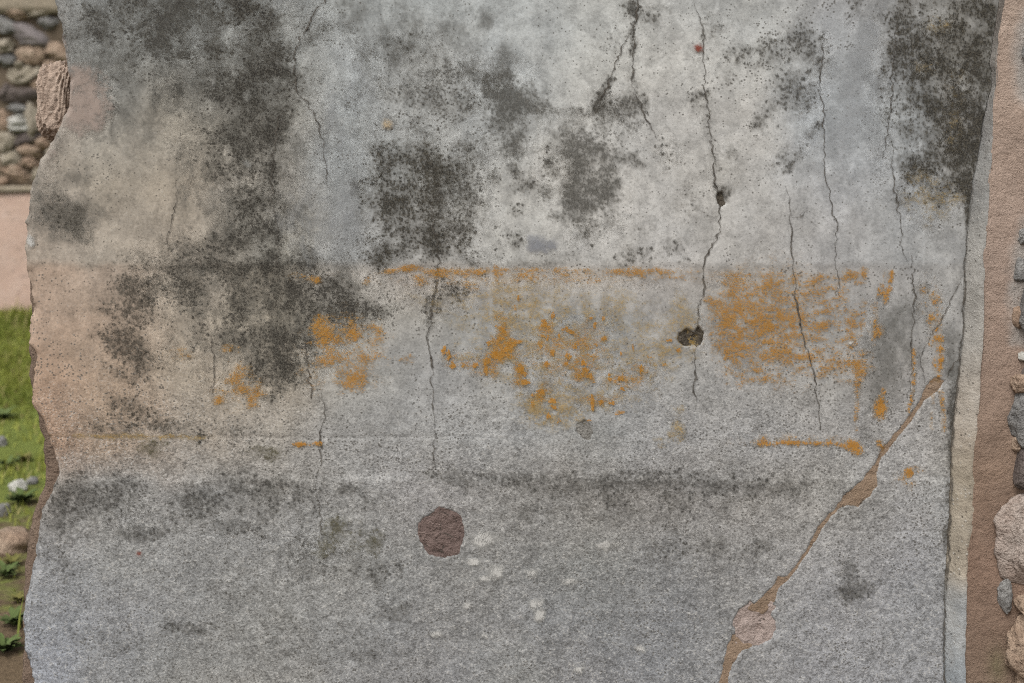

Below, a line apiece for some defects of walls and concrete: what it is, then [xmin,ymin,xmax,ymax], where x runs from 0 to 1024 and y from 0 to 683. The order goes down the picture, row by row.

damp [73,0,390,444]
damp [346,58,698,427]
rust [381,264,699,290]
rust [441,295,652,423]
crack [596,0,656,137]
spalling [677,327,704,347]
crack [693,12,721,398]
damp [724,22,830,130]
rust [704,267,893,455]
crack [719,16,974,683]
damp [878,0,997,229]
spalling [418,506,503,582]